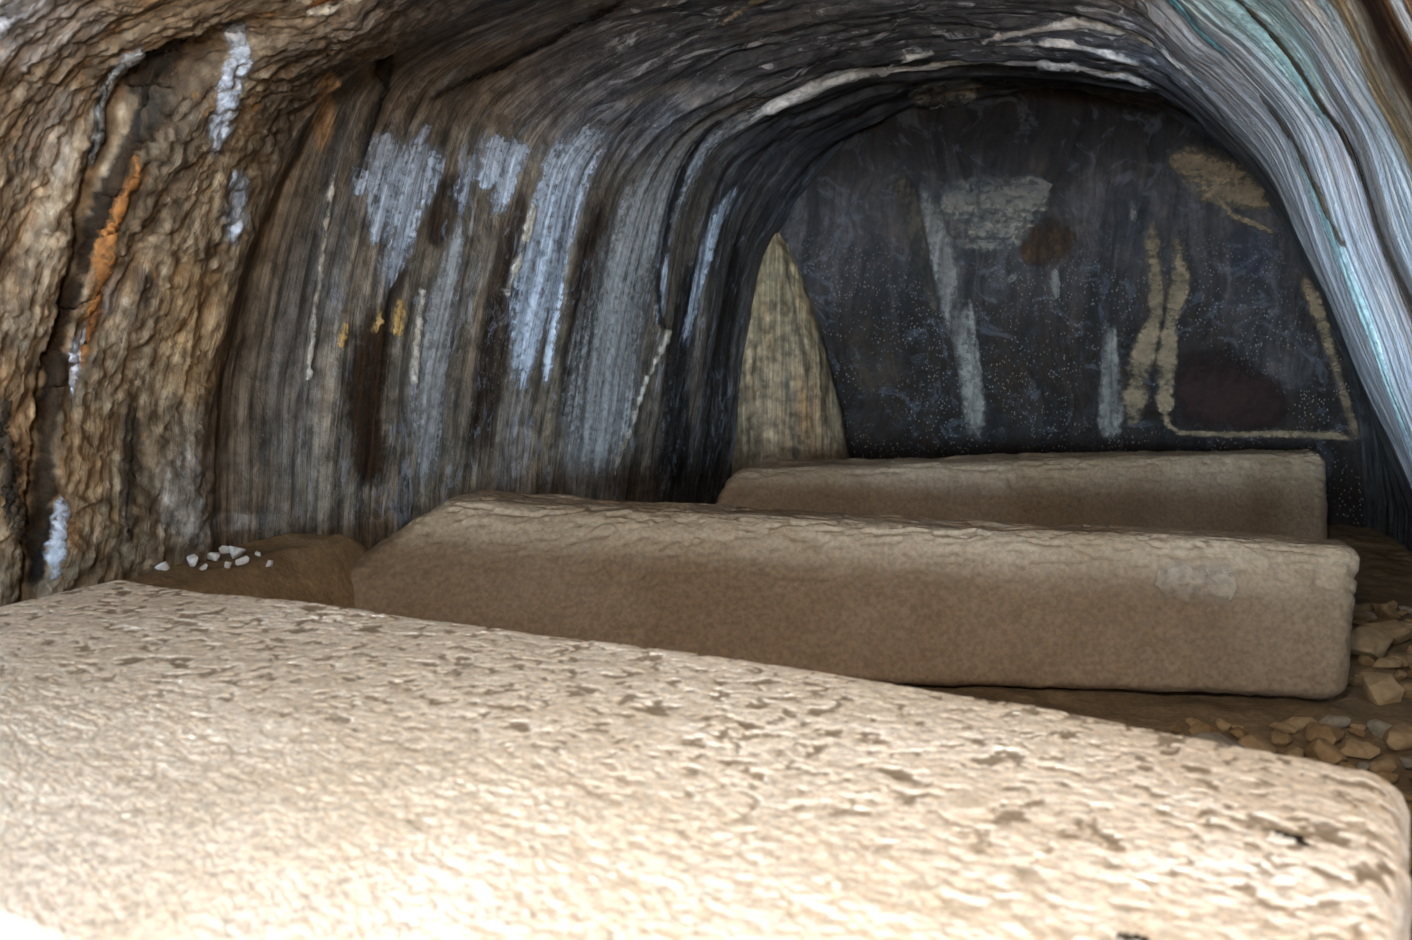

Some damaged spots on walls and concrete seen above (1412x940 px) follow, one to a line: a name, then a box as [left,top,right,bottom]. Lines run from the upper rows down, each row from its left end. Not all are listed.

water stain [87,38,186,164]
water stain [208,22,253,157]
water stain [68,321,87,392]
corrosion [77,154,142,368]
water stain [226,174,250,245]
water stain [352,124,446,287]
water stain [410,133,531,479]
water stain [510,124,606,389]
water stain [656,113,737,340]
water stain [895,174,984,434]
water stain [0,401,26,542]
water stain [46,497,71,579]